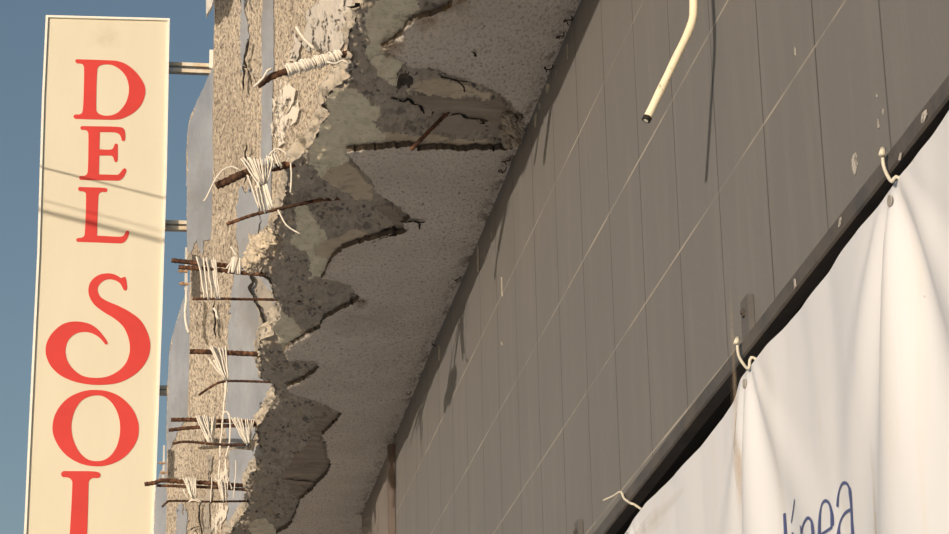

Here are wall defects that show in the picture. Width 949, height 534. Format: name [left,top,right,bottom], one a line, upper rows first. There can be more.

crack [242,39,252,93]
spalling [144,0,525,534]